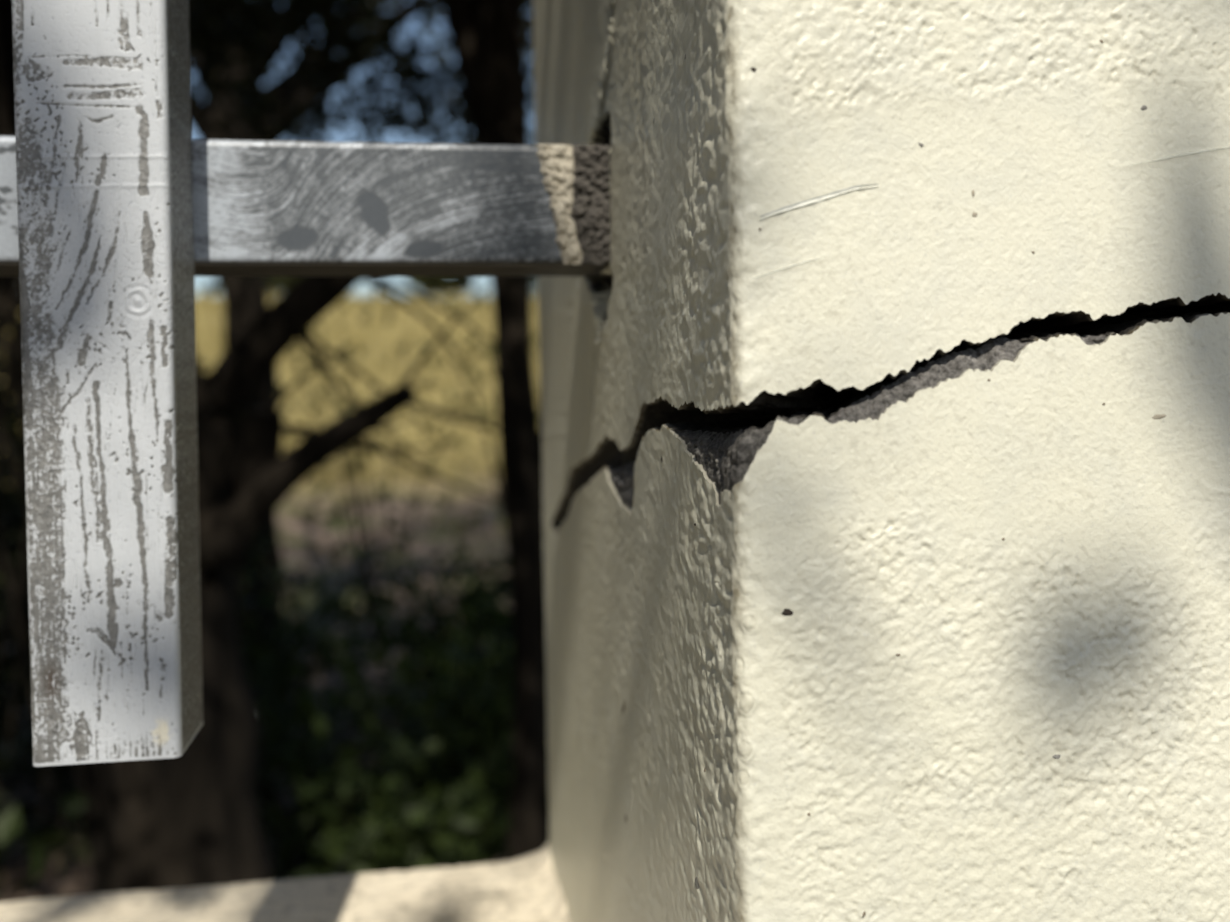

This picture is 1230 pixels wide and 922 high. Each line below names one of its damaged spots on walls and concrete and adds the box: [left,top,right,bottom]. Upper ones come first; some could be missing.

crack [551,292,1230,535]